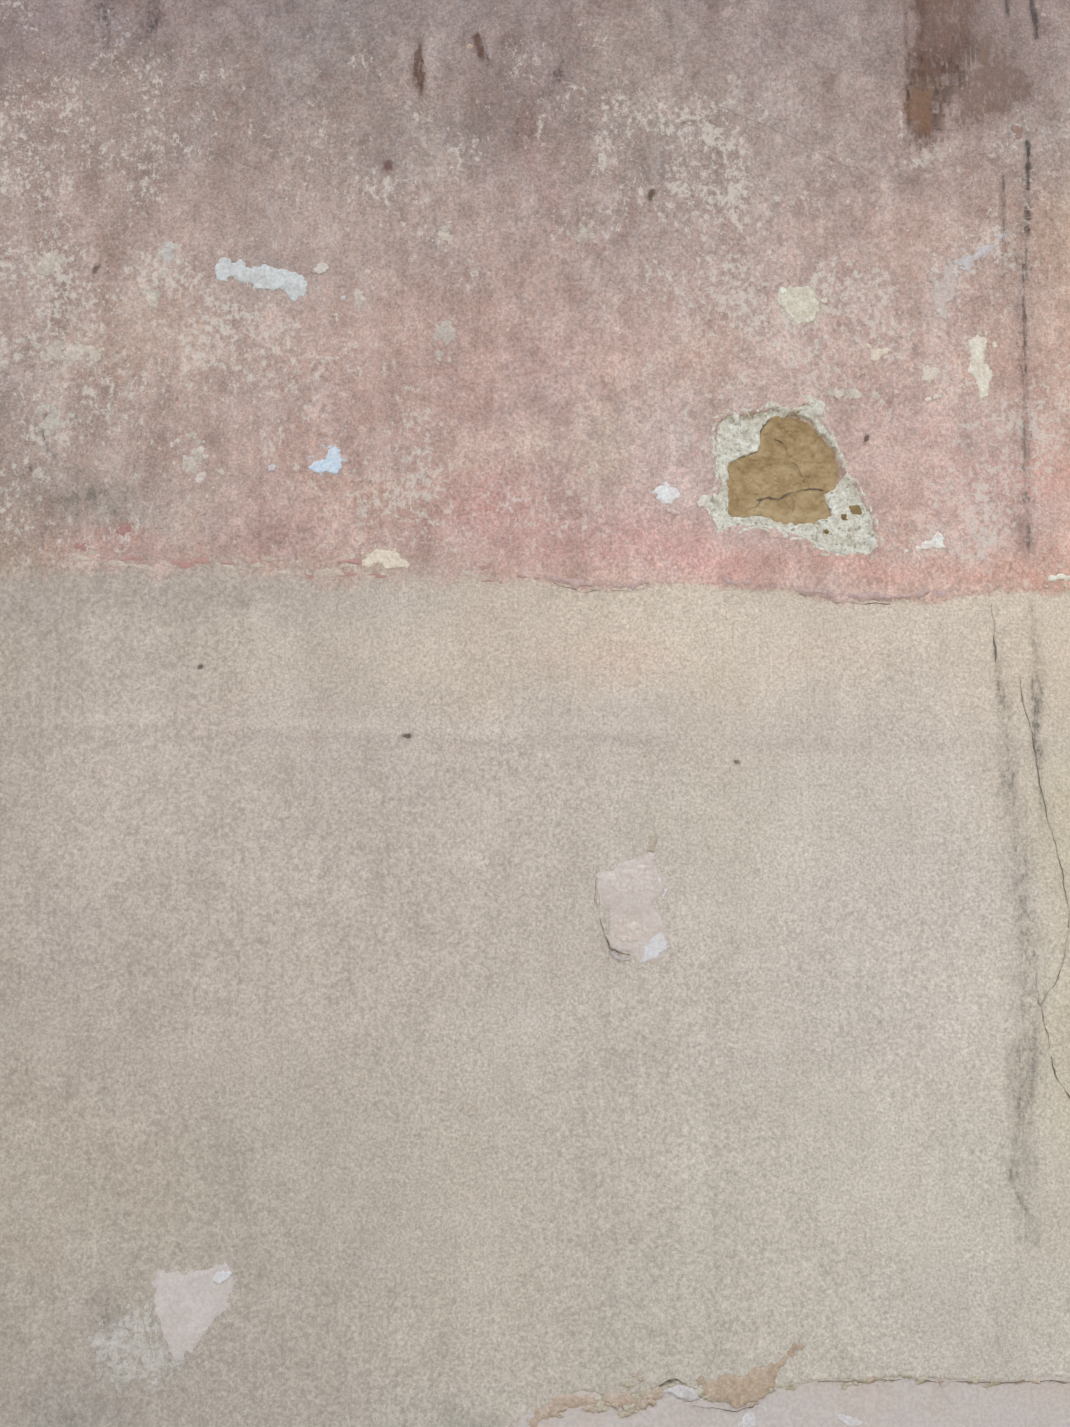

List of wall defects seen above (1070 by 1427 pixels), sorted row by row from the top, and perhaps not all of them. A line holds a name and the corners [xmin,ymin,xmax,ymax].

rust [904,0,1033,149]
peeling [210,250,376,322]
peeling [764,276,833,330]
peeling [928,219,1013,328]
peeling [306,432,354,483]
spalling [646,325,998,557]
peeling [53,534,430,581]
peeling [903,527,951,565]
peeling [591,831,670,973]
crack [991,609,1070,1099]
peeling [83,1261,238,1404]
peeling [511,1339,1070,1427]